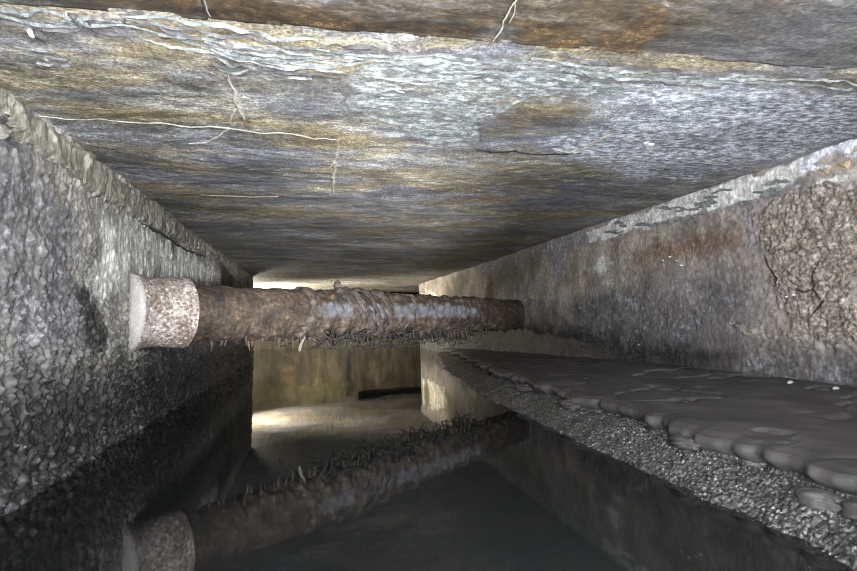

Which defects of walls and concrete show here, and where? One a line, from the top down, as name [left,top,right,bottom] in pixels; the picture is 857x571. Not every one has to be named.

crack [201,0,210,19]
crack [492,0,517,44]
spalling [479,139,857,353]